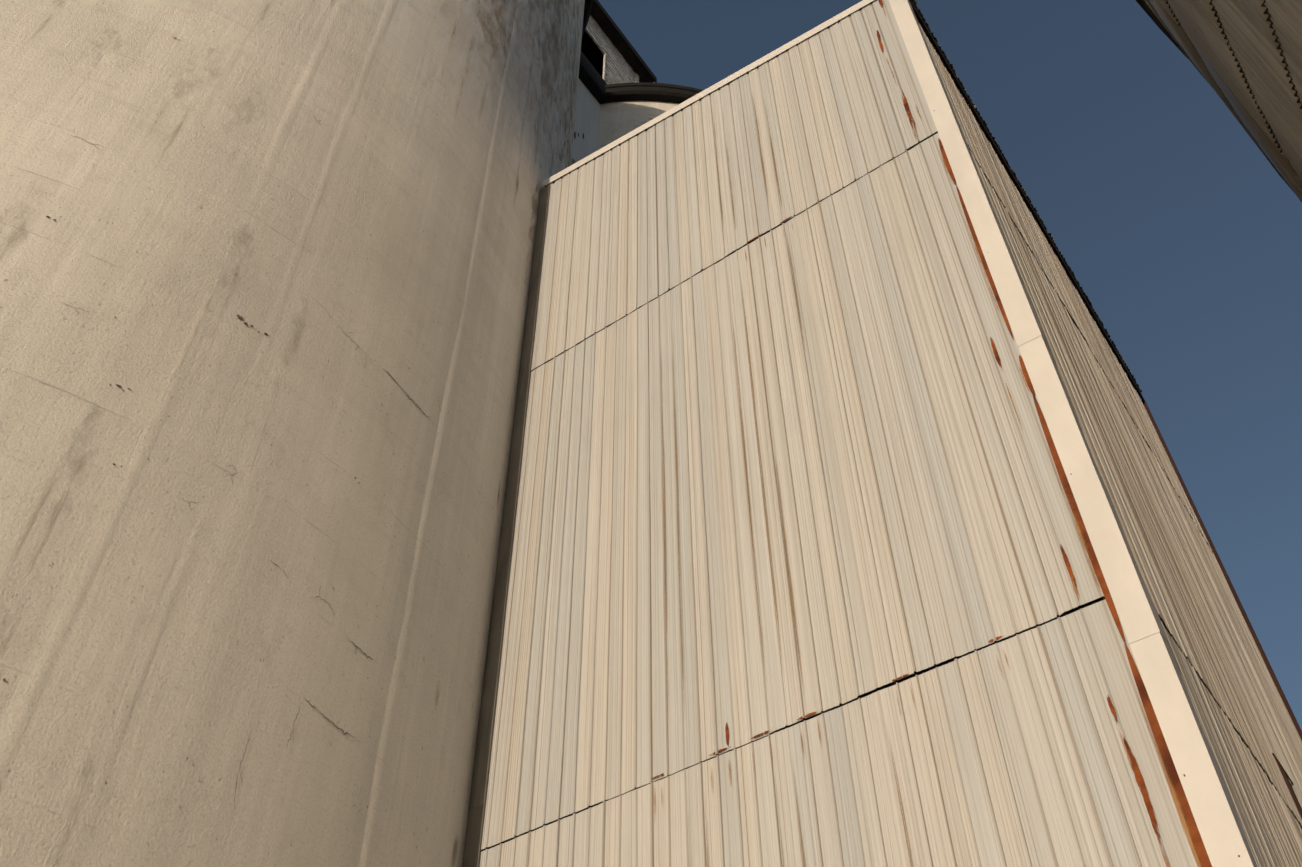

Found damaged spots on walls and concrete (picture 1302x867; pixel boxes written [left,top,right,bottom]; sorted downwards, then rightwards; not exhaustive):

rust [902,91,921,137]
rust [938,139,1013,338]
rust [1019,355,1212,867]